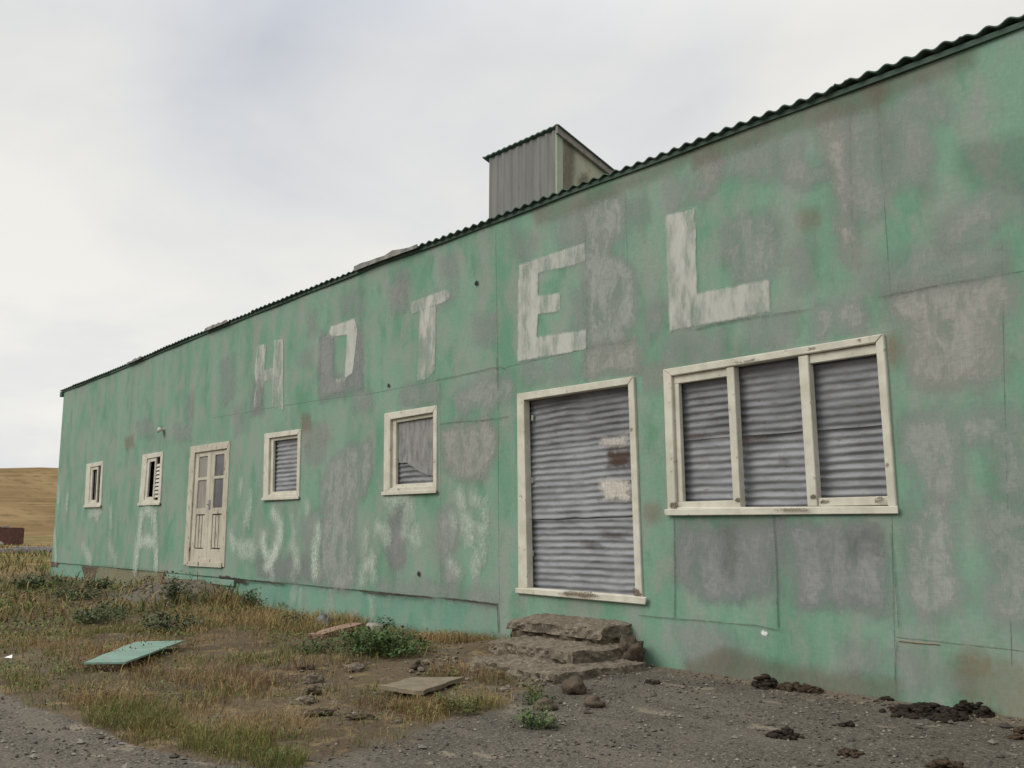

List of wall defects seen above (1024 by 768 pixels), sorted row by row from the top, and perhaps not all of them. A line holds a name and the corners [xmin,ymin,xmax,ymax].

peeling [583,195,640,378]
peeling [890,274,1013,390]
peeling [441,417,497,573]
peeling [600,437,627,447]
peeling [601,479,631,501]
corrosion [607,449,630,467]
peeling [779,520,888,615]